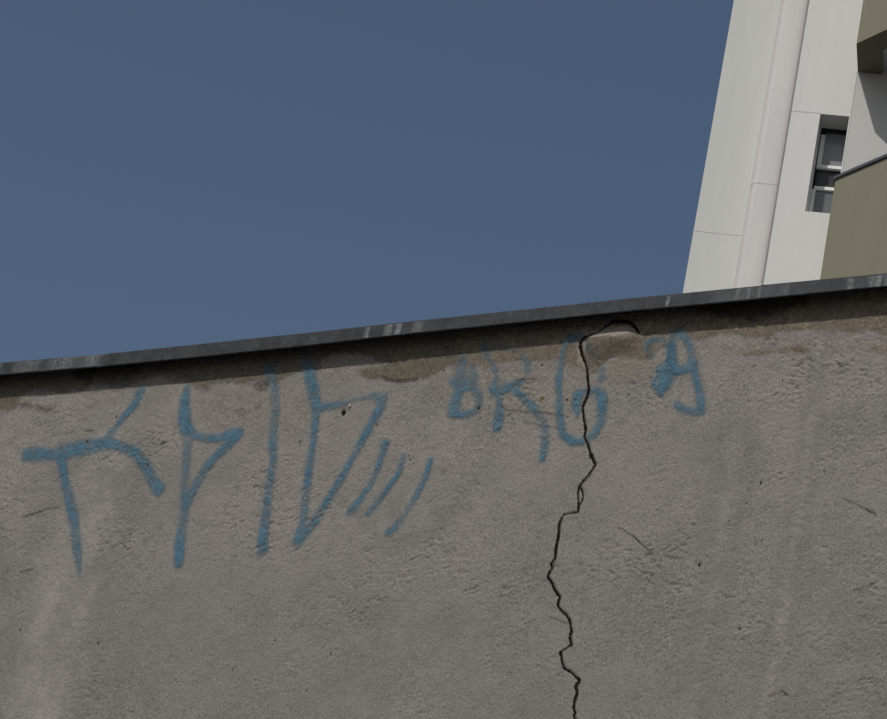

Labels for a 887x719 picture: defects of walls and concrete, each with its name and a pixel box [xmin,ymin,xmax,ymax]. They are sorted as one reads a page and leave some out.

leakage [0,275,887,719]
crack [503,319,639,719]